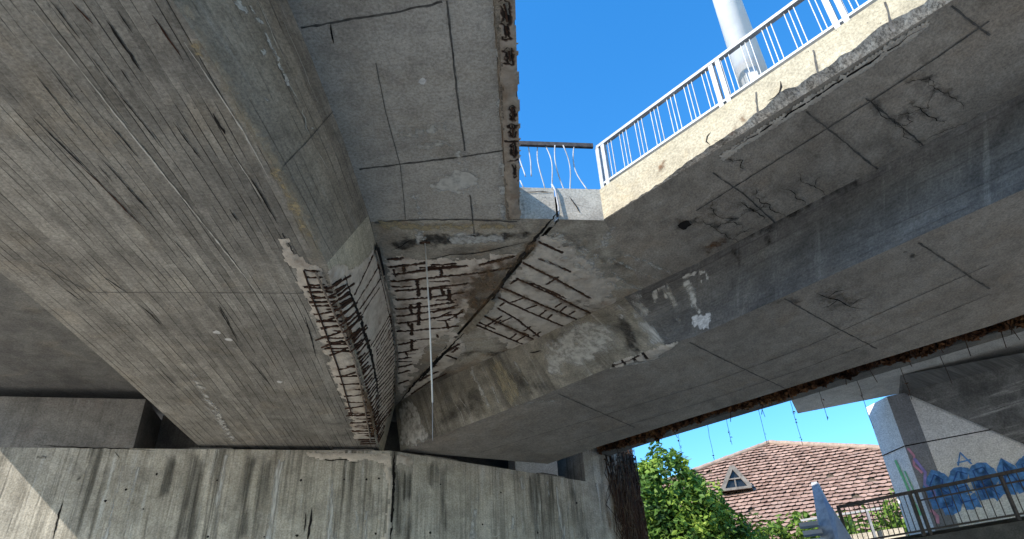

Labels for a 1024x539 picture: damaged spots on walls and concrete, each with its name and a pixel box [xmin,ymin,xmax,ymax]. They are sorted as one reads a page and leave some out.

spalling [498,0,521,219]
spalling [604,0,952,220]
spalling [278,233,620,539]
crack [393,239,524,260]
water stain [545,232,677,373]
spalling [610,341,678,369]
water stain [682,271,711,330]